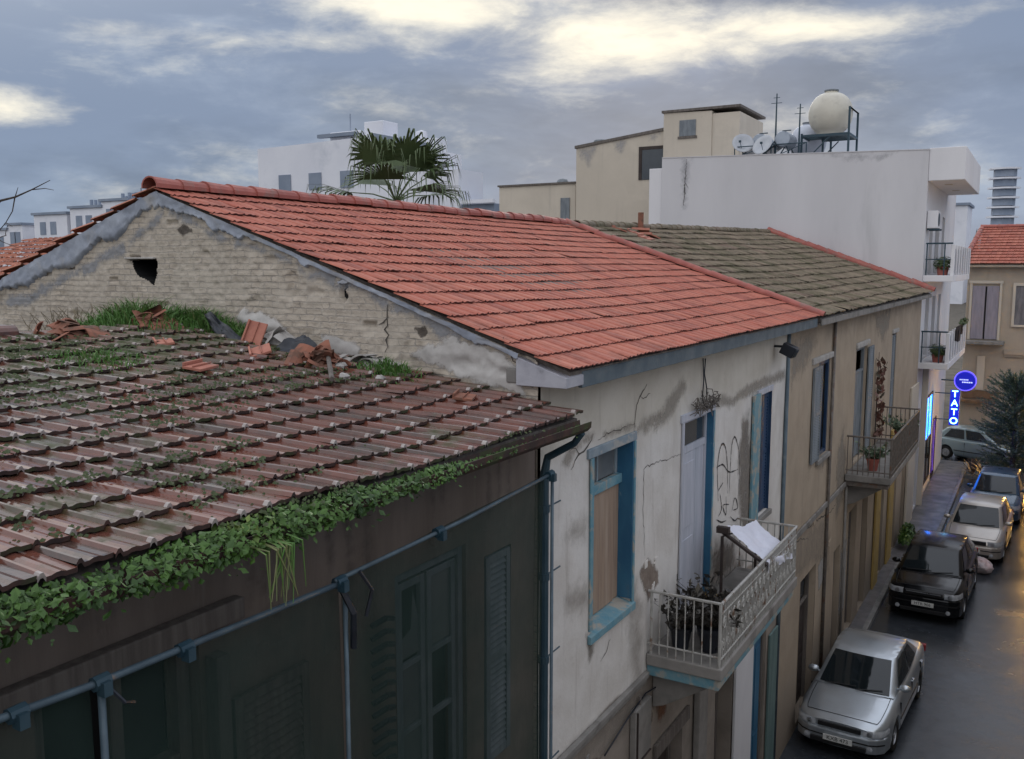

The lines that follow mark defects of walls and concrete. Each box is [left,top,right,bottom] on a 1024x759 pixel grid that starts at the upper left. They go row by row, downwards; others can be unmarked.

spalling [124,257,158,285]
crack [379,305,389,352]
crack [570,385,650,468]
leakage [644,384,685,431]
flaking render [640,556,658,600]